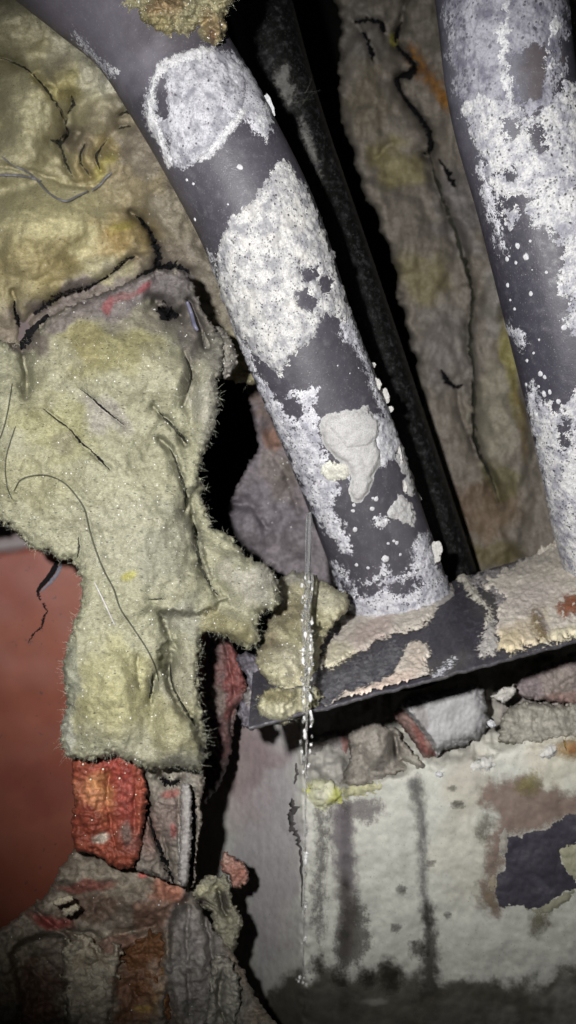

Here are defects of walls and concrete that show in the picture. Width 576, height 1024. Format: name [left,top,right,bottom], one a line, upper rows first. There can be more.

leakage [141,45,296,171]
leakage [440,0,576,337]
leakage [206,115,576,706]
leakage [266,777,576,1024]
peeling [487,814,576,914]